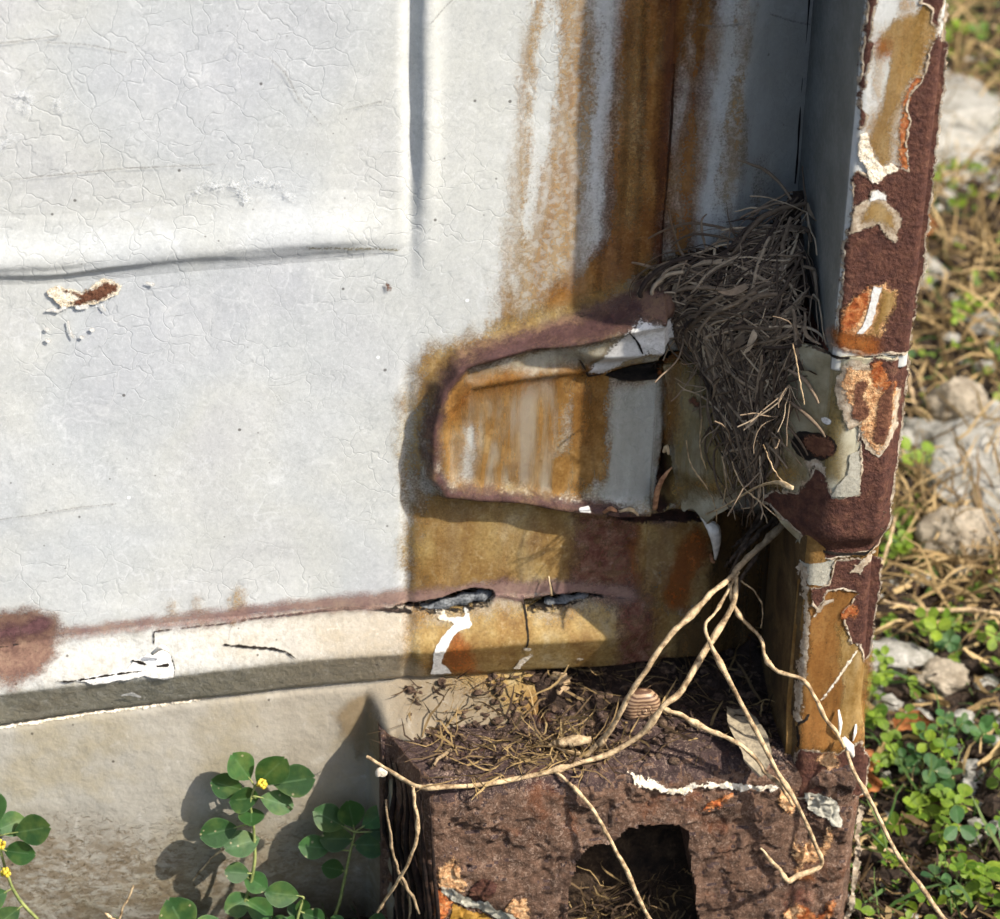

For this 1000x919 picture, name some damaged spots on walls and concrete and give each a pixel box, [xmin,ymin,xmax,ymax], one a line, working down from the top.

peeling [847,132,902,243]
peeling [46,278,122,339]
peeling [840,282,898,338]
corrosion [0,0,772,715]
corrosion [750,0,949,800]
crack [153,576,626,658]
peeling [431,607,472,674]
peeling [793,559,835,722]
corrosion [778,790,796,814]
peeling [432,857,530,919]
corrosion [783,825,836,919]
corrosion [844,805,865,919]